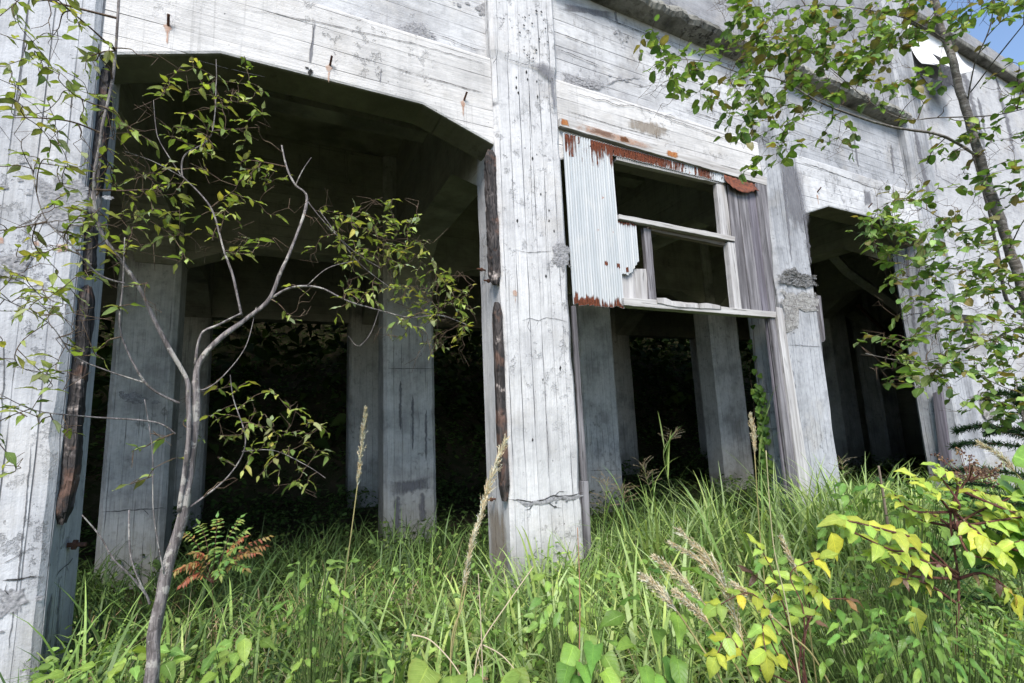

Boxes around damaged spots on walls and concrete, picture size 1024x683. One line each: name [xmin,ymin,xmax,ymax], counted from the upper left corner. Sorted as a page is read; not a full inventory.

corrosion [561,119,759,193]
spalling [518,210,571,270]
corrosion [574,292,625,309]
spalling [777,267,819,333]
damp [399,381,427,456]
crack [508,416,605,510]